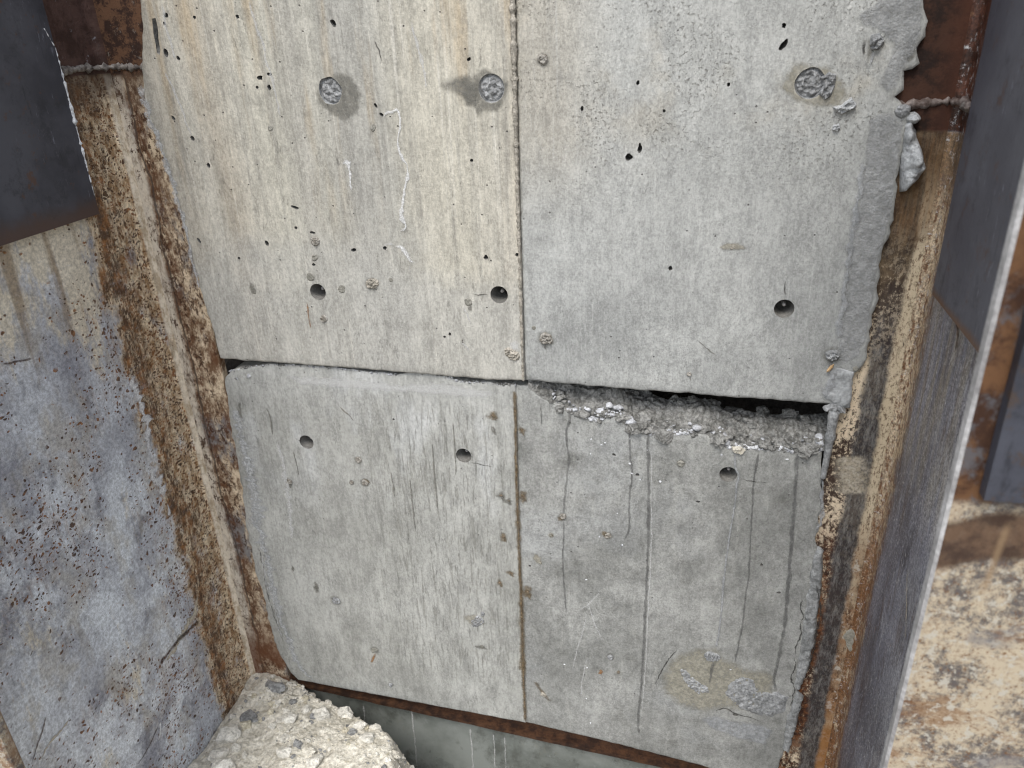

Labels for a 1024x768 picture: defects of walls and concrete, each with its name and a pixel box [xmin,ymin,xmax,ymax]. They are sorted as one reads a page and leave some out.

spalling [862,33,884,63]
peeling [818,72,856,114]
damp [566,409,615,445]
damp [629,429,698,488]
damp [724,442,798,525]
damp [782,481,797,637]
damp [637,501,652,731]